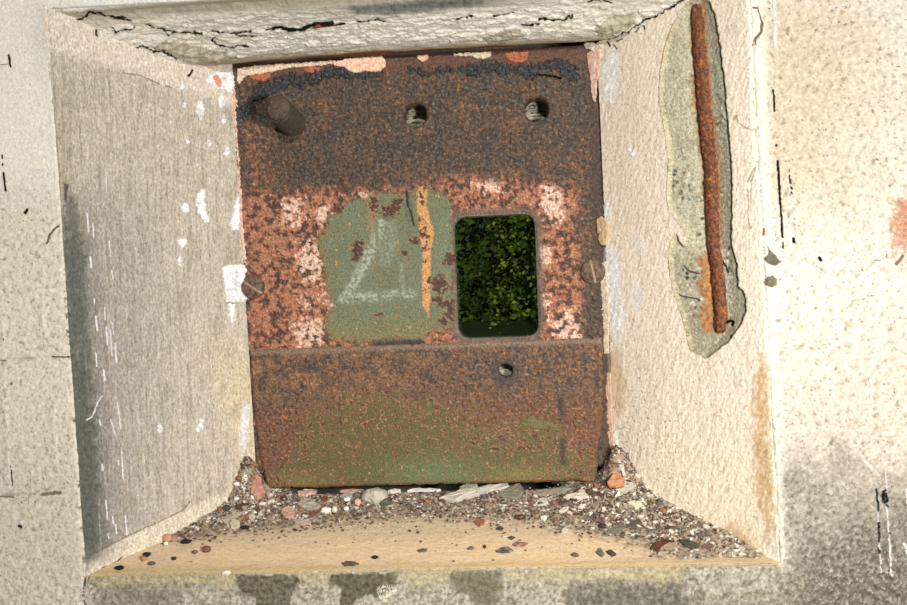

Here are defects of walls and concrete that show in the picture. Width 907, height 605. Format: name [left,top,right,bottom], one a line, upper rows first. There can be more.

crack [76,11,385,89]
crack [456,0,612,26]
crack [607,0,684,49]
spalling [658,0,748,359]
corrosion [891,200,907,245]
corrosion [697,253,715,332]
water stain [878,507,892,576]
water stain [96,565,681,605]